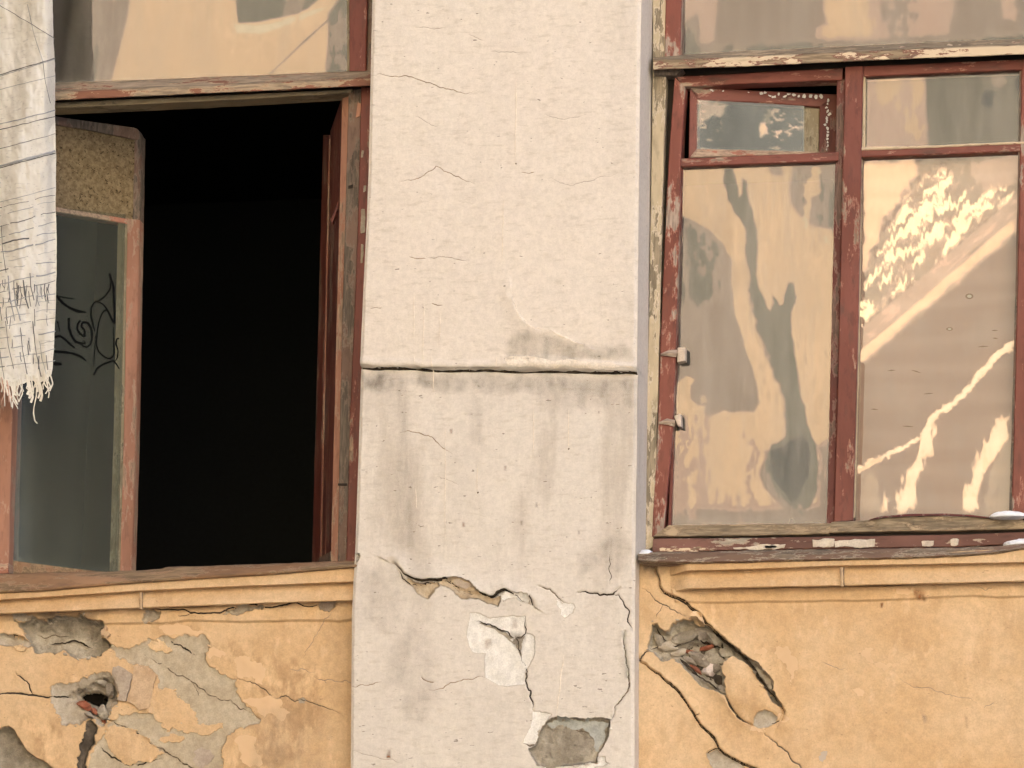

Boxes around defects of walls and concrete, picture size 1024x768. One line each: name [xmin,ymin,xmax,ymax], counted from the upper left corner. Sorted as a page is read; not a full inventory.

crack [362,367,637,375]
peeling [0,610,290,768]
crack [139,602,381,713]
peeling [407,577,535,686]
spalling [523,711,612,768]
crack [393,558,756,768]
spalling [646,611,790,733]
crack [725,696,802,768]